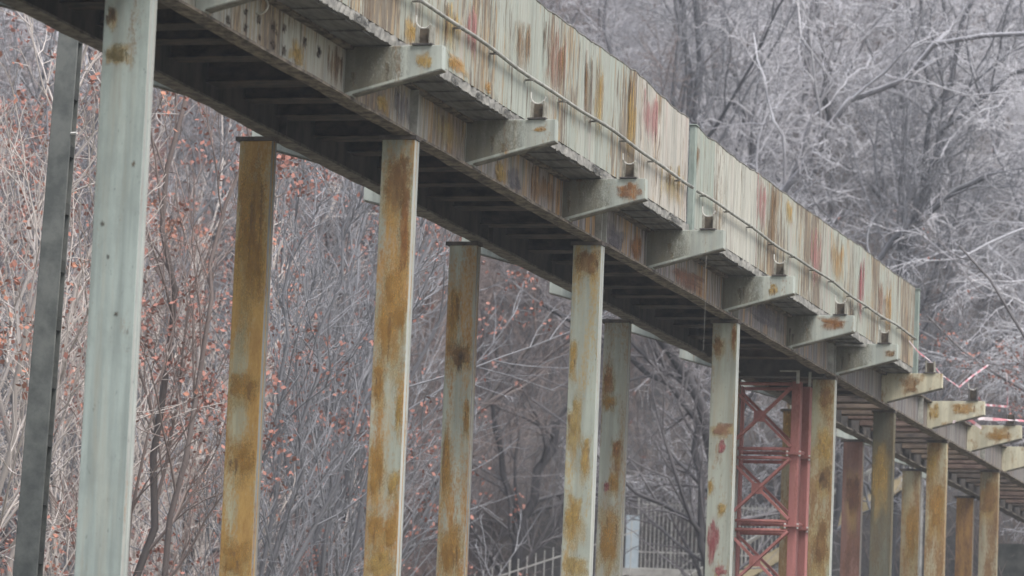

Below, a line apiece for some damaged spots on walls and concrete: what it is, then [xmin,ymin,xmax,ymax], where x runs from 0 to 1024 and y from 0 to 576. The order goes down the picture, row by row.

rust [585,55,604,132]
rust [372,157,412,408]
rust [822,308,855,330]
rust [366,447,399,555]
rust [395,393,403,435]
rust [441,432,451,509]
rust [567,401,590,484]
rust [562,496,619,576]
rust [602,366,614,411]
rust [812,521,829,576]
rust [814,430,831,497]
rust [905,448,944,566]